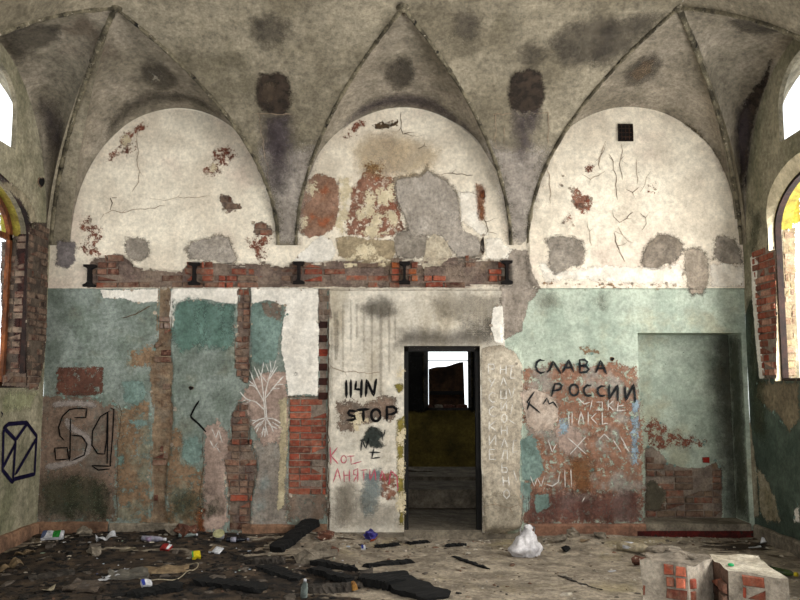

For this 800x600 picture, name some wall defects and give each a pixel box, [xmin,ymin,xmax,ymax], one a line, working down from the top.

damp [255,72,293,186]
damp [507,50,546,151]
crack [100,196,203,220]
peeling [299,160,405,241]
crack [582,141,651,262]
peeling [0,212,511,533]
peeling [515,346,723,525]
damp [40,476,109,519]